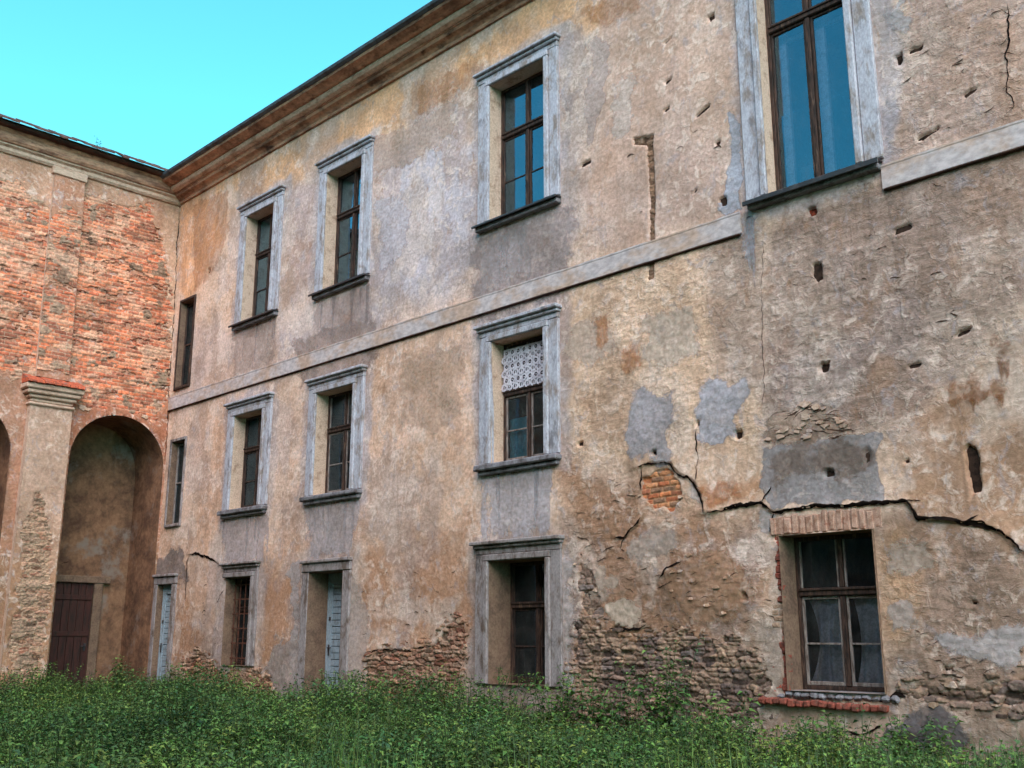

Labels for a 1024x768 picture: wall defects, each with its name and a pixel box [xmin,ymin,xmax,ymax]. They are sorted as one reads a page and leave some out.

crack [1000,5,1017,114]
peeling [764,400,853,445]
crack [185,552,218,598]
crack [615,518,640,549]
spalling [562,377,787,744]
crack [638,426,1023,551]
spalling [361,611,471,714]
spalling [887,600,1024,720]